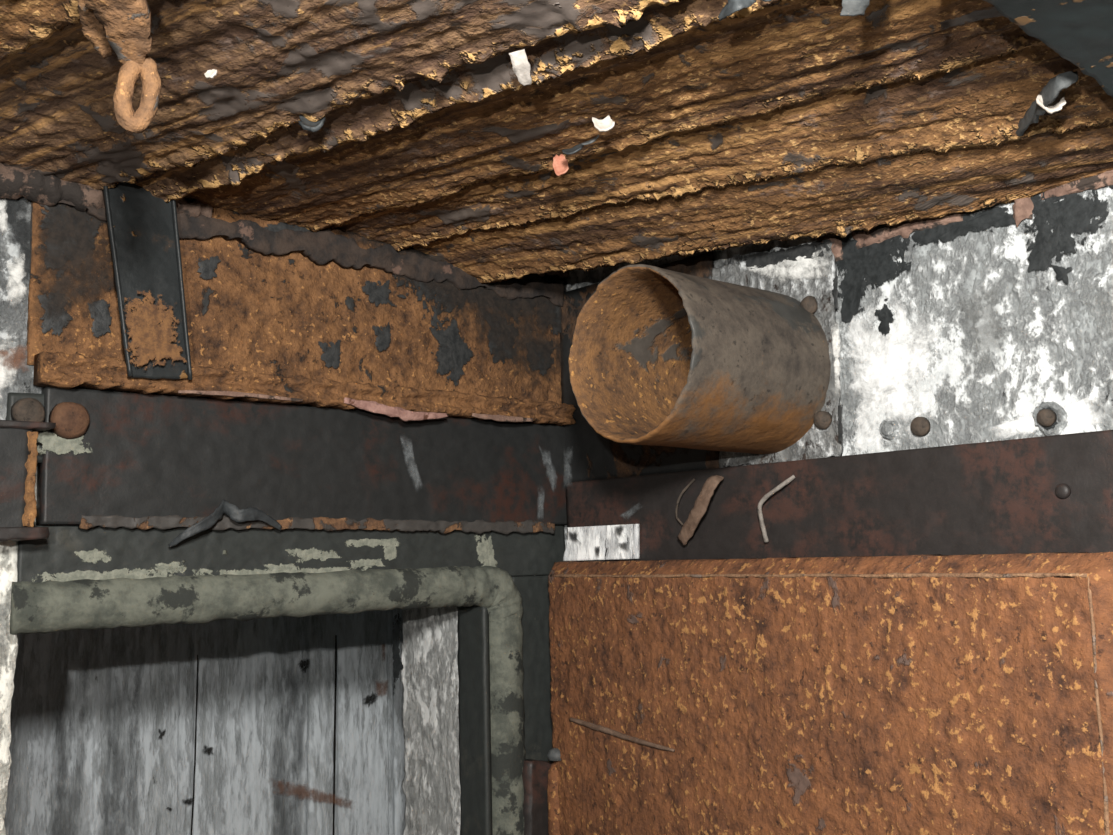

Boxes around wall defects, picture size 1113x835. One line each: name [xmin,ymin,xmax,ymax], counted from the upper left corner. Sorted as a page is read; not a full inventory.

peeling [718,0,772,21]
peeling [840,0,870,17]
peeling [509,49,532,86]
peeling [1015,71,1079,137]
peeling [553,115,615,176]
peeling [733,185,1113,335]
rust [123,290,186,370]
peeling [362,274,561,386]
peeling [32,538,399,583]
rust [78,515,555,535]
peeling [474,534,498,567]
peeling [392,614,403,696]